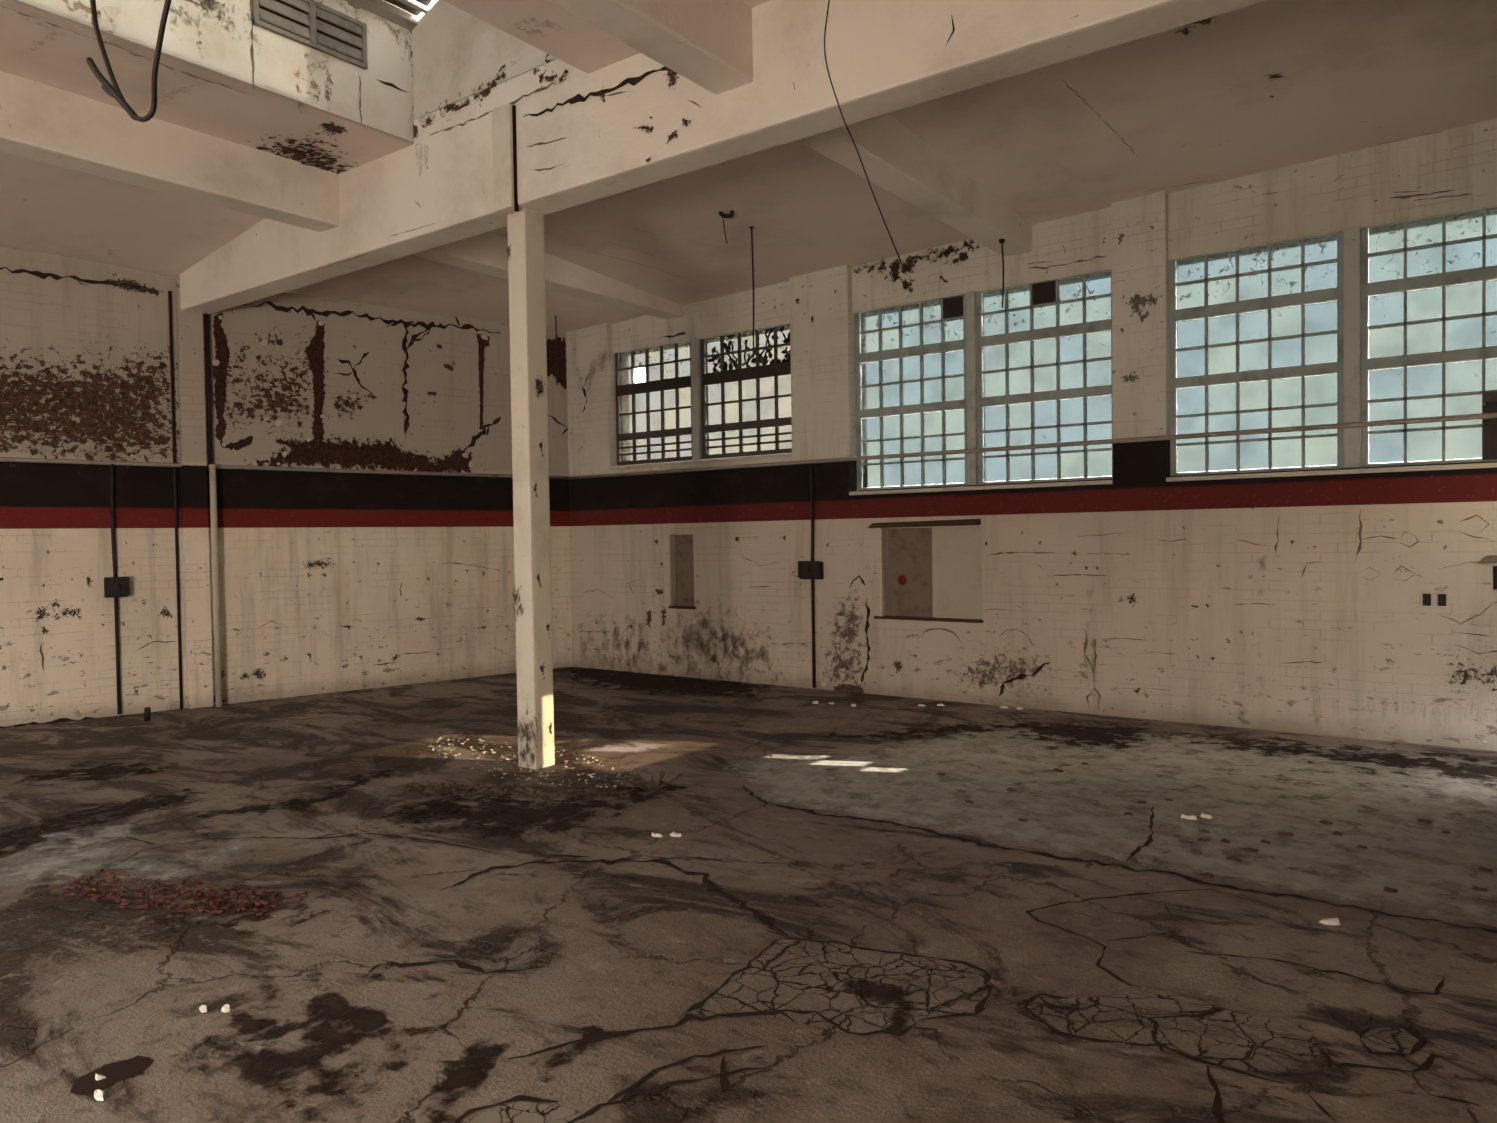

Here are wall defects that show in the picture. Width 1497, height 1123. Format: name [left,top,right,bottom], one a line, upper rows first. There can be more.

spalling [248,121,359,174]
crack [524,66,669,171]
crack [0,267,159,292]
peeling [0,339,180,473]
flaking render [211,313,474,478]
flaking render [476,333,490,430]
damp [553,667,772,697]
crack [121,785,1497,1123]